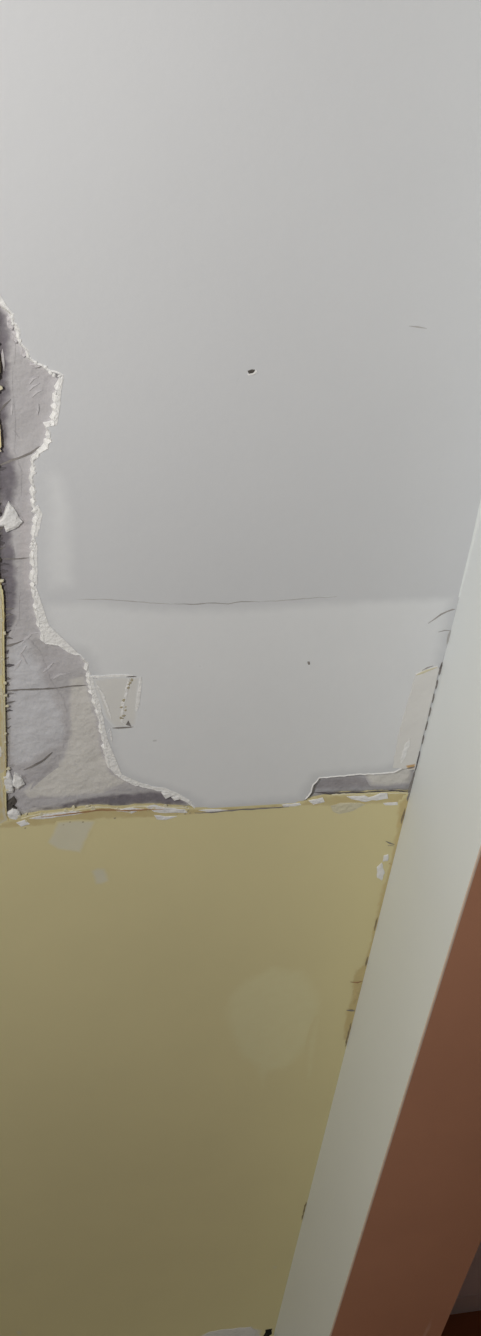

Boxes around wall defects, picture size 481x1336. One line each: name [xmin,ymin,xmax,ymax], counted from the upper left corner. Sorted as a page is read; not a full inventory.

flaking render [0,0,481,1046]